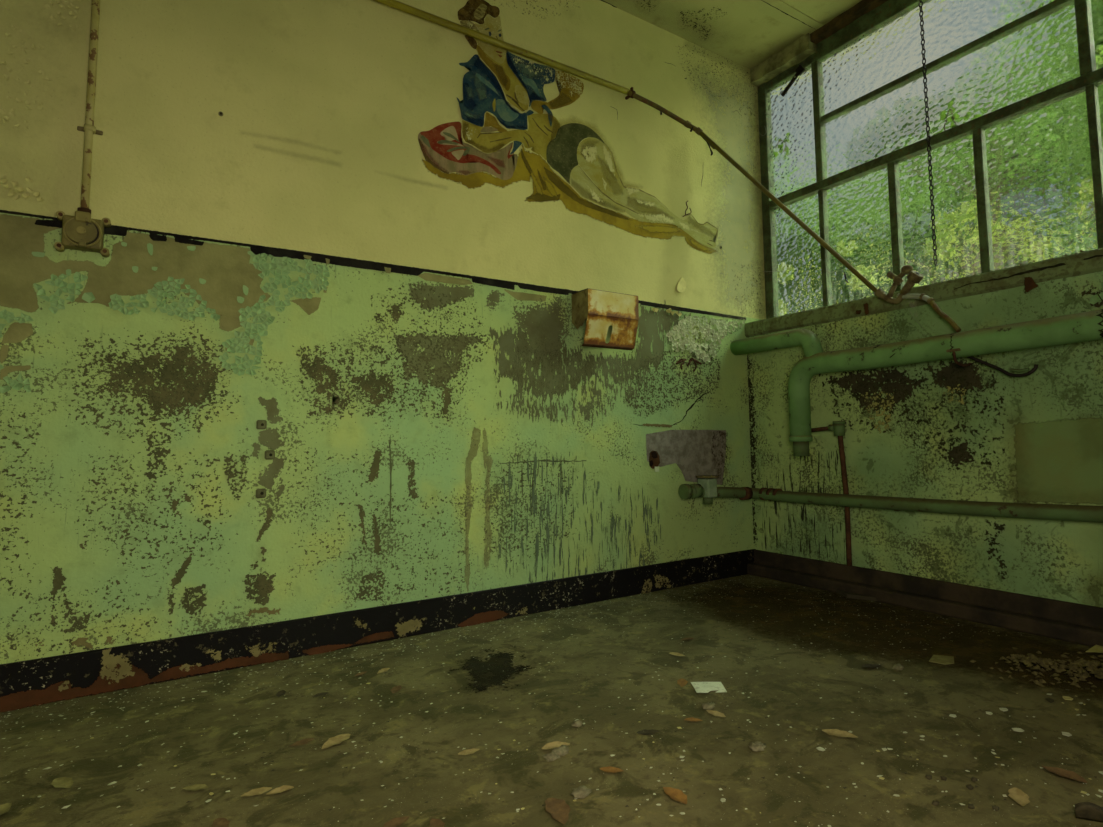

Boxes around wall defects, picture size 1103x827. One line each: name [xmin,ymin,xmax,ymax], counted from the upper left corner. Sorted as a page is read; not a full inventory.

peeling [0,214,579,712]
water stain [464,427,661,592]
peeling [819,355,1006,470]
peeling [984,520,1007,579]
water stain [448,645,531,693]